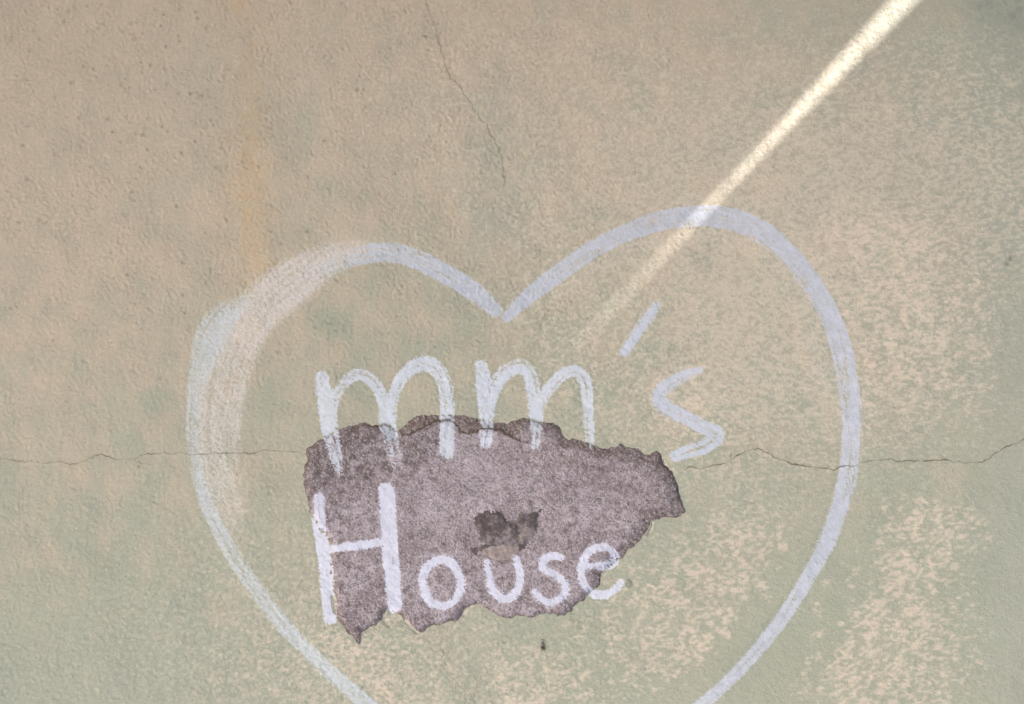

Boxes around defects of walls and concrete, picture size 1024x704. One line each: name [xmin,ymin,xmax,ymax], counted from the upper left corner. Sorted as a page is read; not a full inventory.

peeling [301,415,803,704]